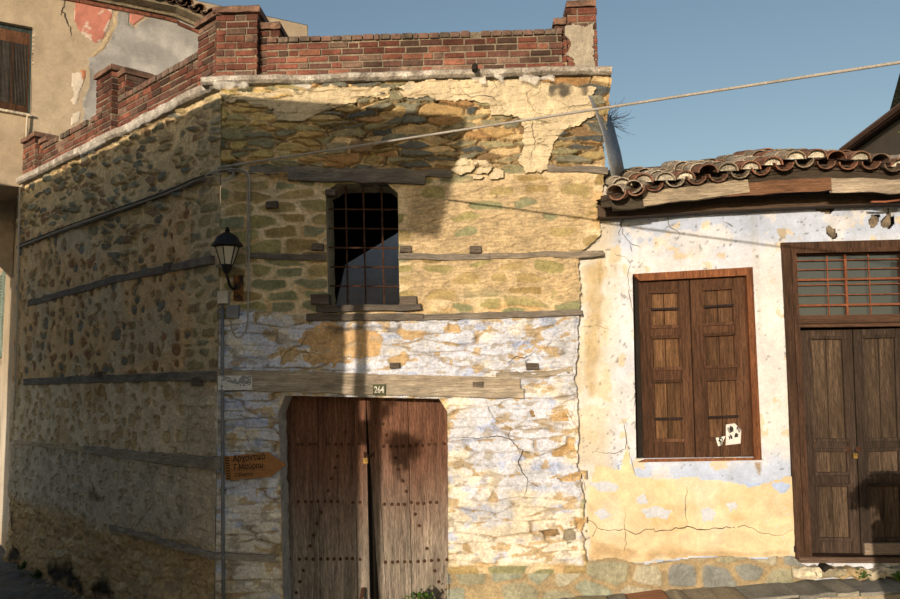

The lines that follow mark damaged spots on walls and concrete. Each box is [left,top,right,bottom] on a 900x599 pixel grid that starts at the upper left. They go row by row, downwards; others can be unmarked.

flaking render [74,0,113,43]
flaking render [129,9,149,26]
flaking render [71,70,86,125]
flaking render [220,79,596,174]
flaking render [451,158,504,180]
flaking render [277,321,409,370]
flaking render [396,328,431,341]
flaking render [443,323,461,333]
crack [596,381,636,475]
peeling [540,447,795,563]
crack [584,486,793,557]